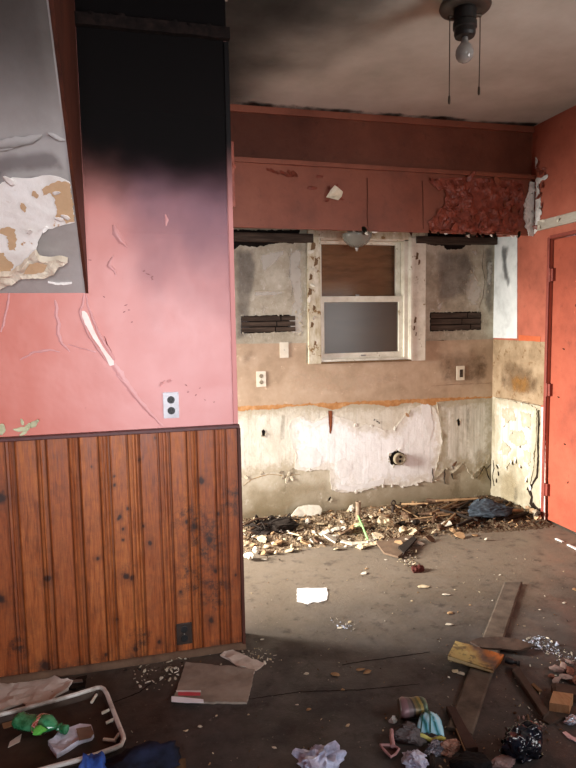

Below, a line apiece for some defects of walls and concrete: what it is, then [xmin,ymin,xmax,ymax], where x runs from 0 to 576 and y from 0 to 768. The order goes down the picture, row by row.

peeling [0,175,75,272]
flaking render [465,160,548,238]
crack [68,293,165,428]
peeling [238,397,542,520]
crack [496,397,540,511]